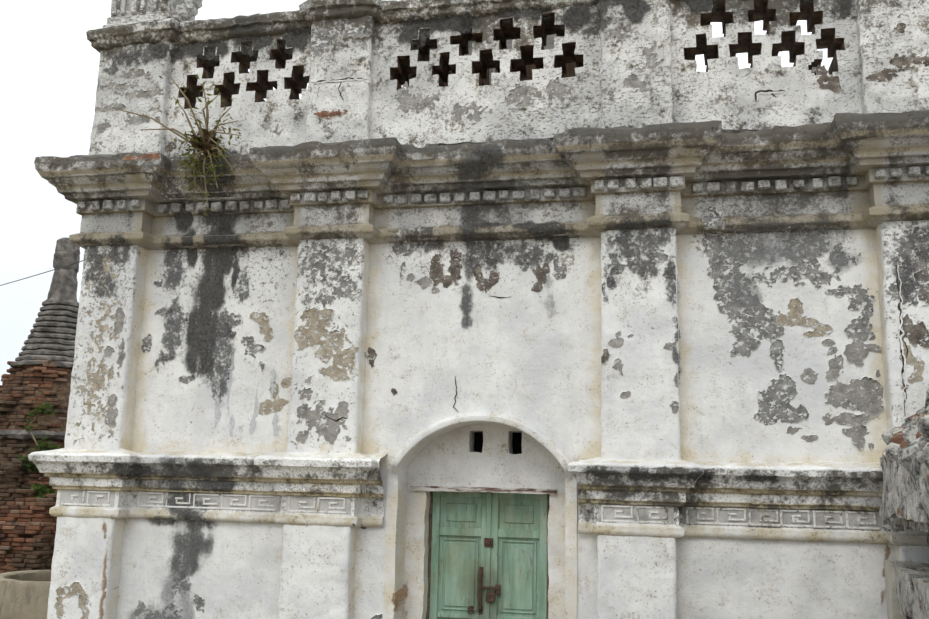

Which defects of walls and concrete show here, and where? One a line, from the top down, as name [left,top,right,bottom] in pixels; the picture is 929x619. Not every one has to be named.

water stain [155,149,259,436]
peeling [217,307,274,373]
peeling [258,233,378,445]
water stain [405,227,444,253]
water stain [457,145,569,328]
peeling [701,206,929,451]
crack [896,267,908,418]
peeling [54,581,90,619]
peeling [134,577,206,619]
water stain [115,458,235,619]
water stain [585,465,714,482]
water stain [740,473,778,482]